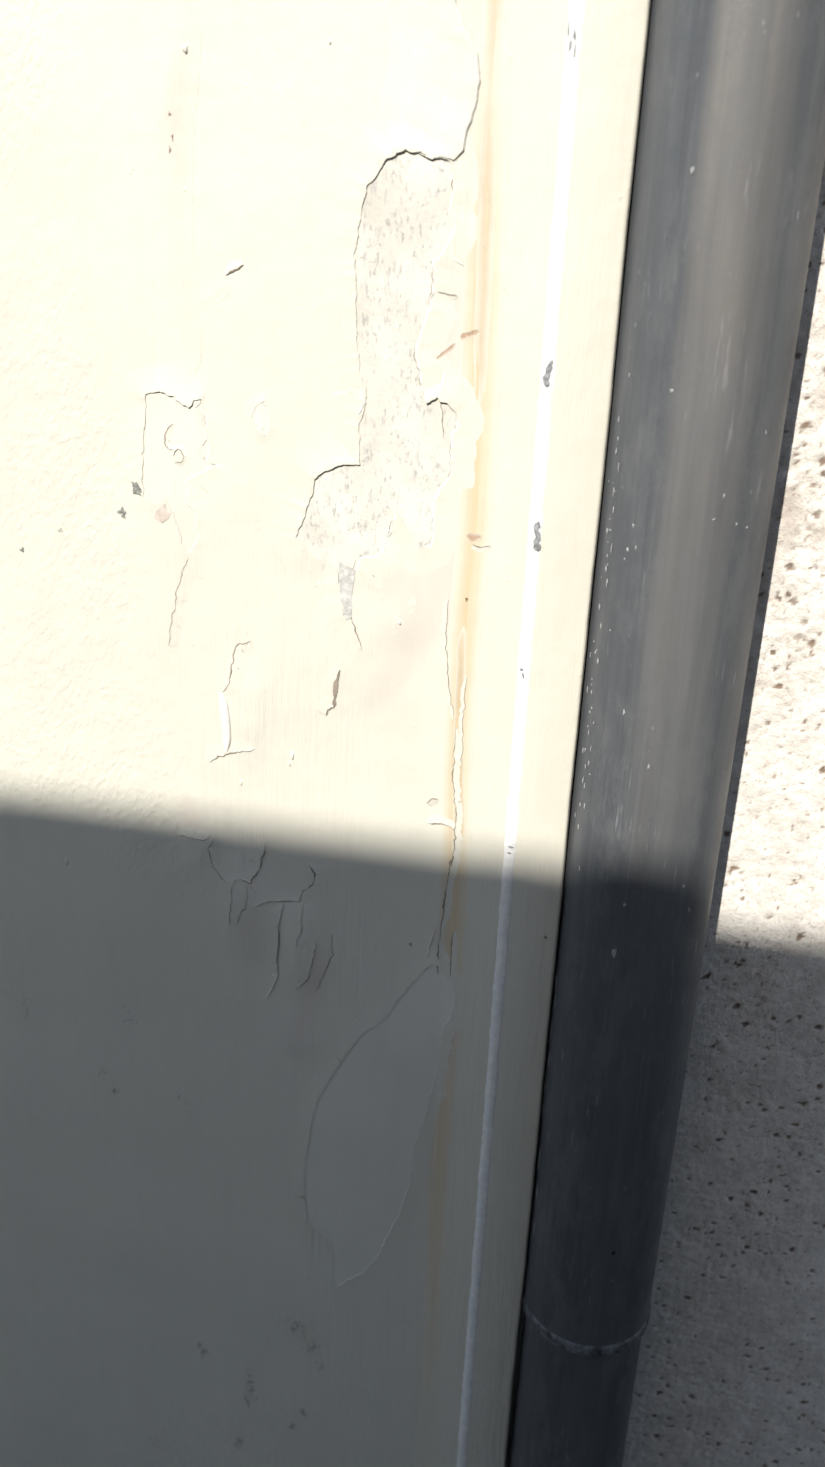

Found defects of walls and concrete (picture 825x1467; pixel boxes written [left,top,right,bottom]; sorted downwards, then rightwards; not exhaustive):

peeling [264,0,485,652]
peeling [117,362,237,578]
peeling [205,641,254,762]